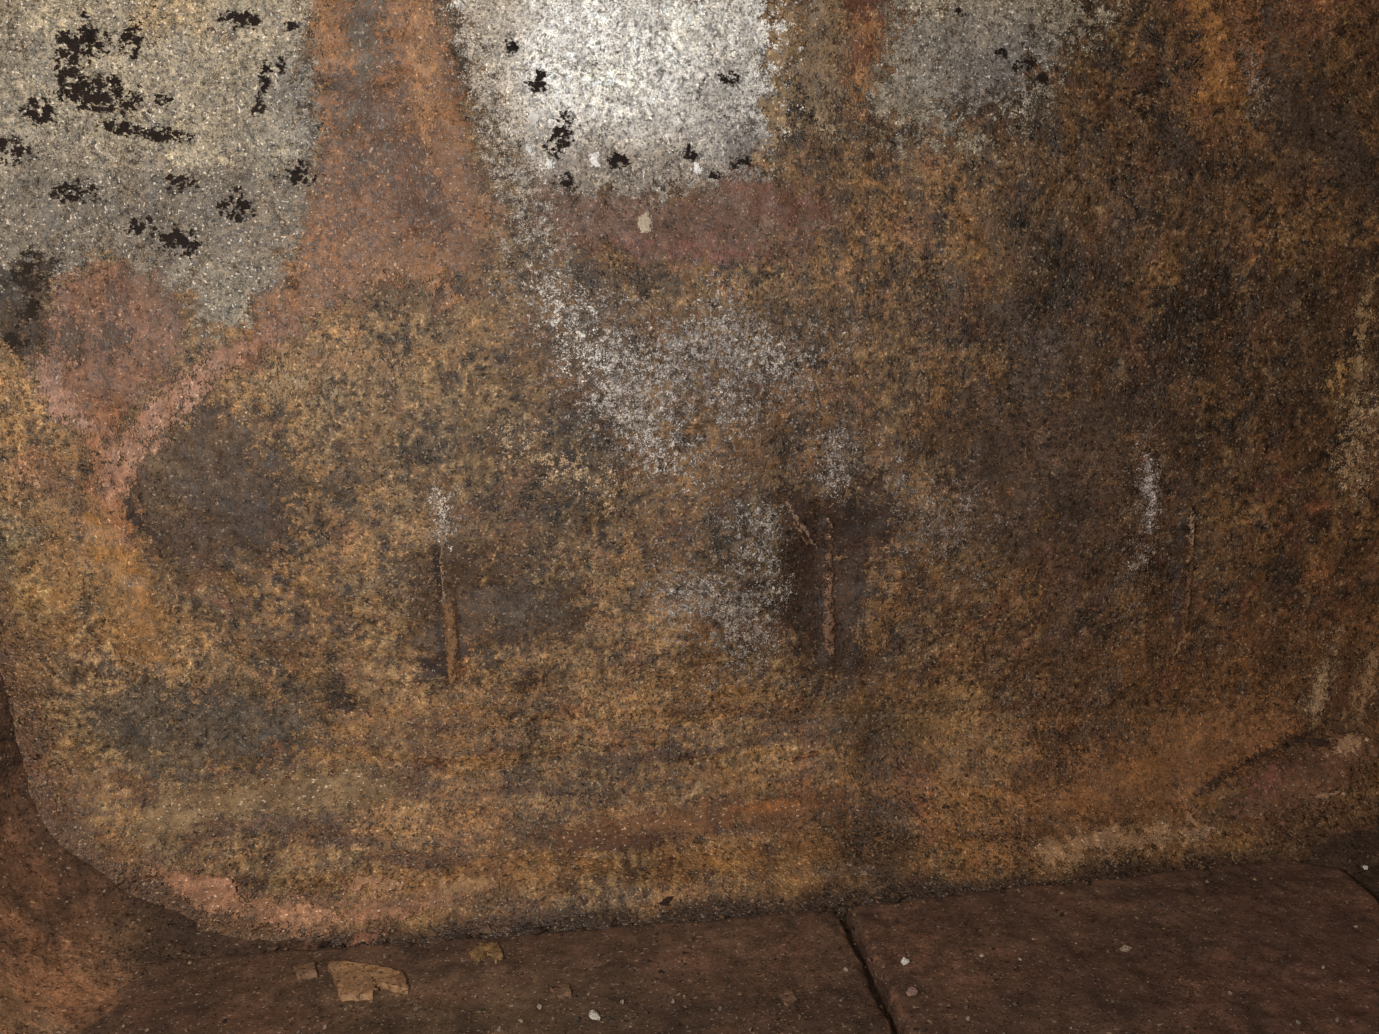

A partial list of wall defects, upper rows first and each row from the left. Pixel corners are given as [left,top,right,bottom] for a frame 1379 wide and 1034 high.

leakage [234,320,428,420]
rust [8,0,892,698]
leakage [434,0,1097,706]
leakage [419,474,462,553]
leakage [1114,418,1174,645]
rust [1297,557,1339,598]
rust [1001,669,1340,872]